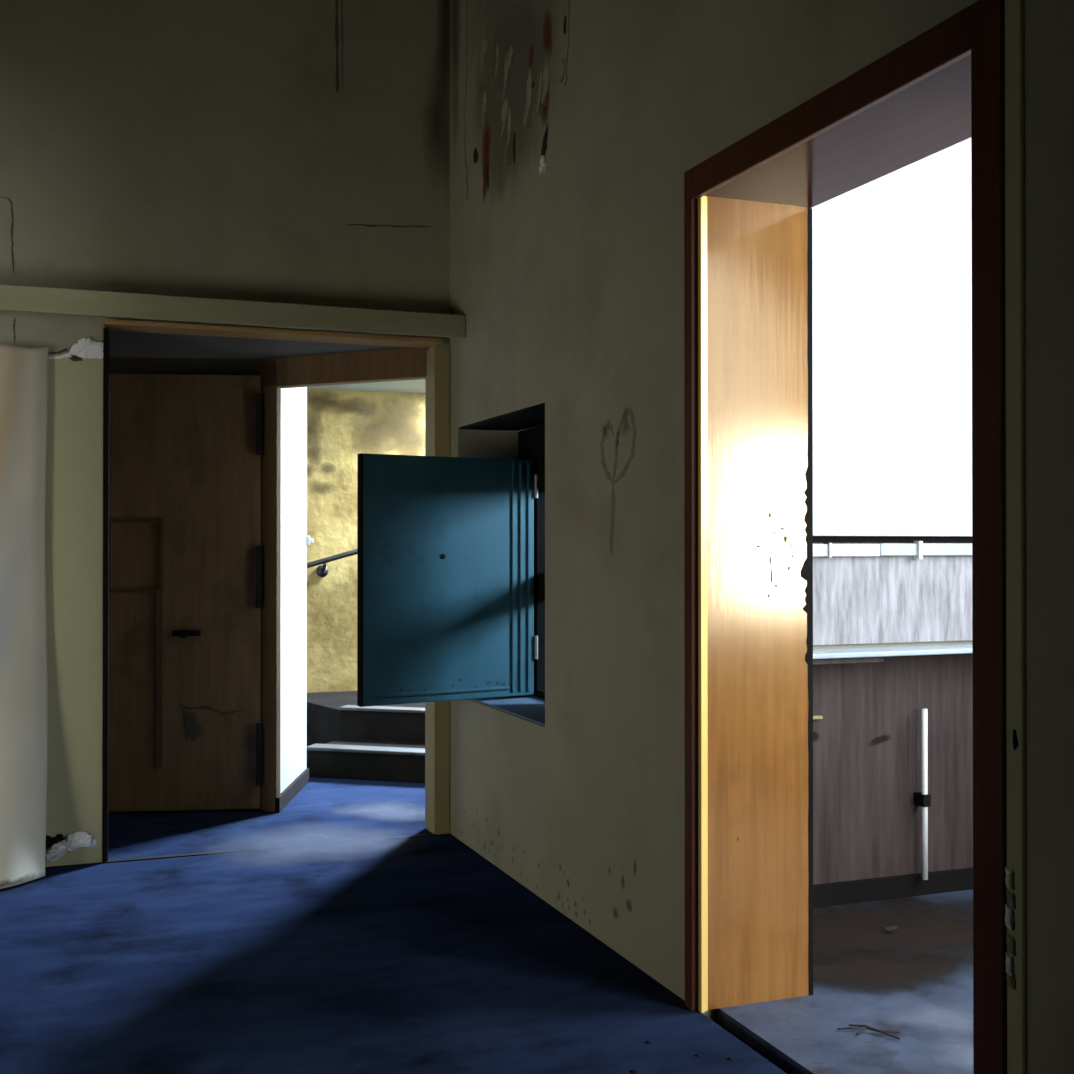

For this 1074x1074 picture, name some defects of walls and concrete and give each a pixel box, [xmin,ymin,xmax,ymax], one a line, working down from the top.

crack [335,0,343,92]